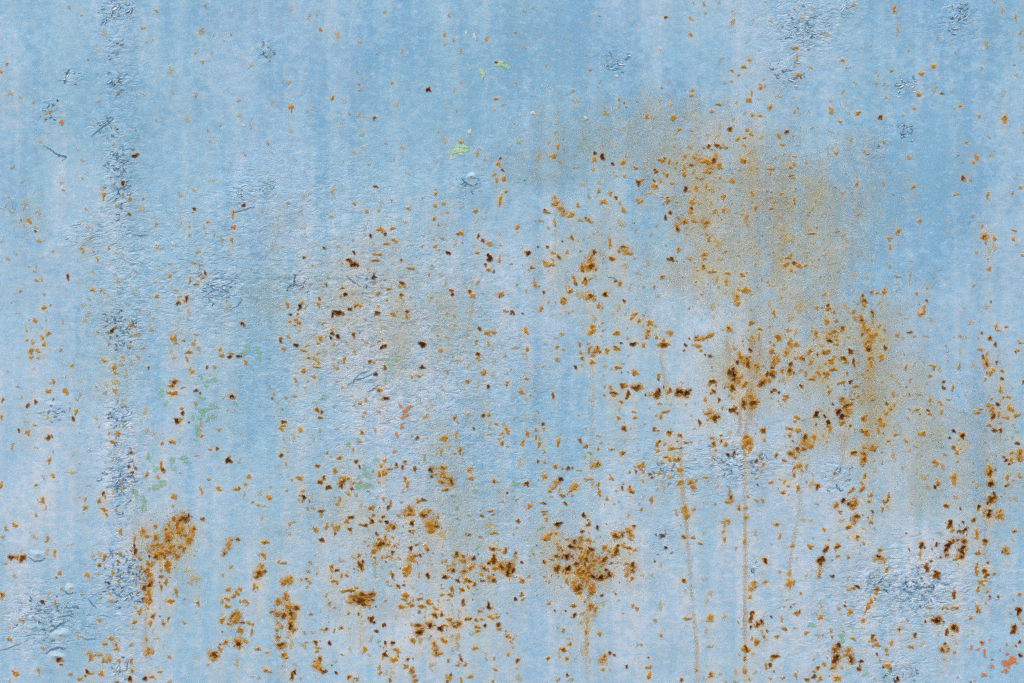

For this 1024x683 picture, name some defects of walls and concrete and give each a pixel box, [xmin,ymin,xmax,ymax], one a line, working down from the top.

corrosion [82,288,154,407]
corrosion [148,250,207,321]
corrosion [194,78,1024,683]
corrosion [56,493,205,683]